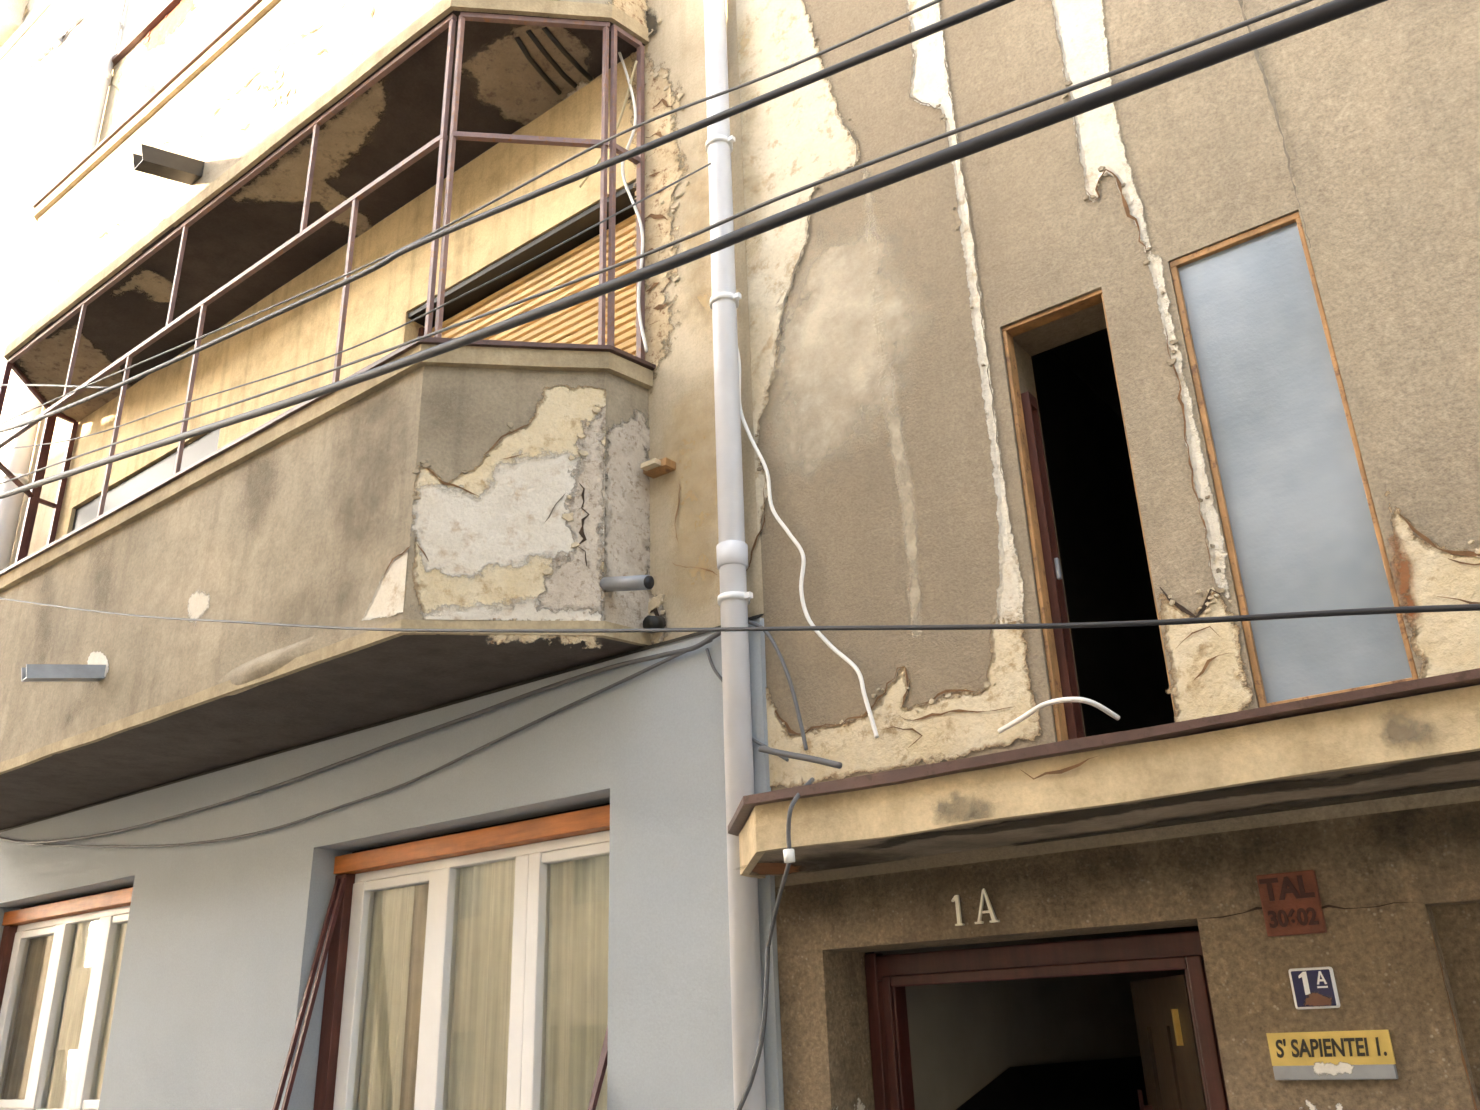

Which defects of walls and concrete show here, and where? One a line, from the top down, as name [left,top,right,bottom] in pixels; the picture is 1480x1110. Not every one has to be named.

peeling [362,385,667,649]
spalling [607,0,691,379]
peeling [736,0,861,571]
peeling [766,0,1042,788]
leakage [802,751,1480,909]
peeling [1050,0,1253,722]
leakage [1383,714,1432,744]
peeling [1384,491,1480,679]